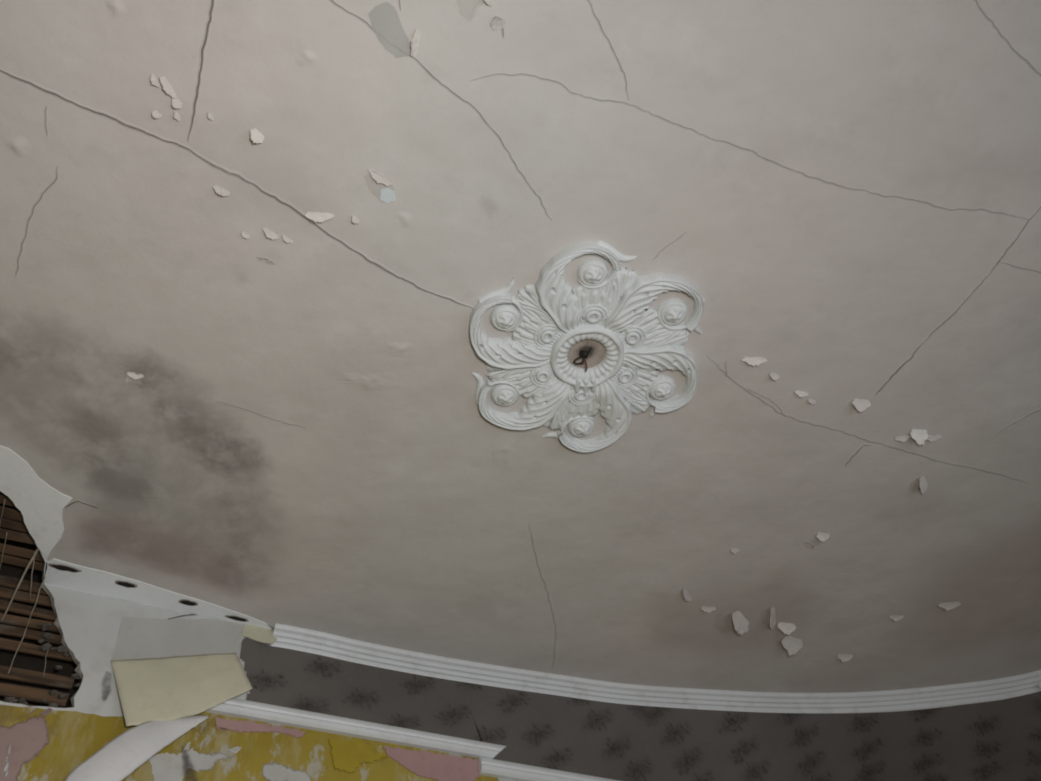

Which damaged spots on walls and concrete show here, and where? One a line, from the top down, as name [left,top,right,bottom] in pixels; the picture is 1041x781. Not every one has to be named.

peeling [368,2,420,58]
peeling [150,74,183,122]
peeling [248,128,264,144]
peeling [305,212,335,223]
crack [329,0,1041,396]
peeling [742,356,780,381]
peeling [851,398,871,412]
peeling [895,429,942,445]
flaking render [0,446,274,781]
peeling [680,588,803,656]
peeling [262,763,311,781]
peeling [328,739,481,781]